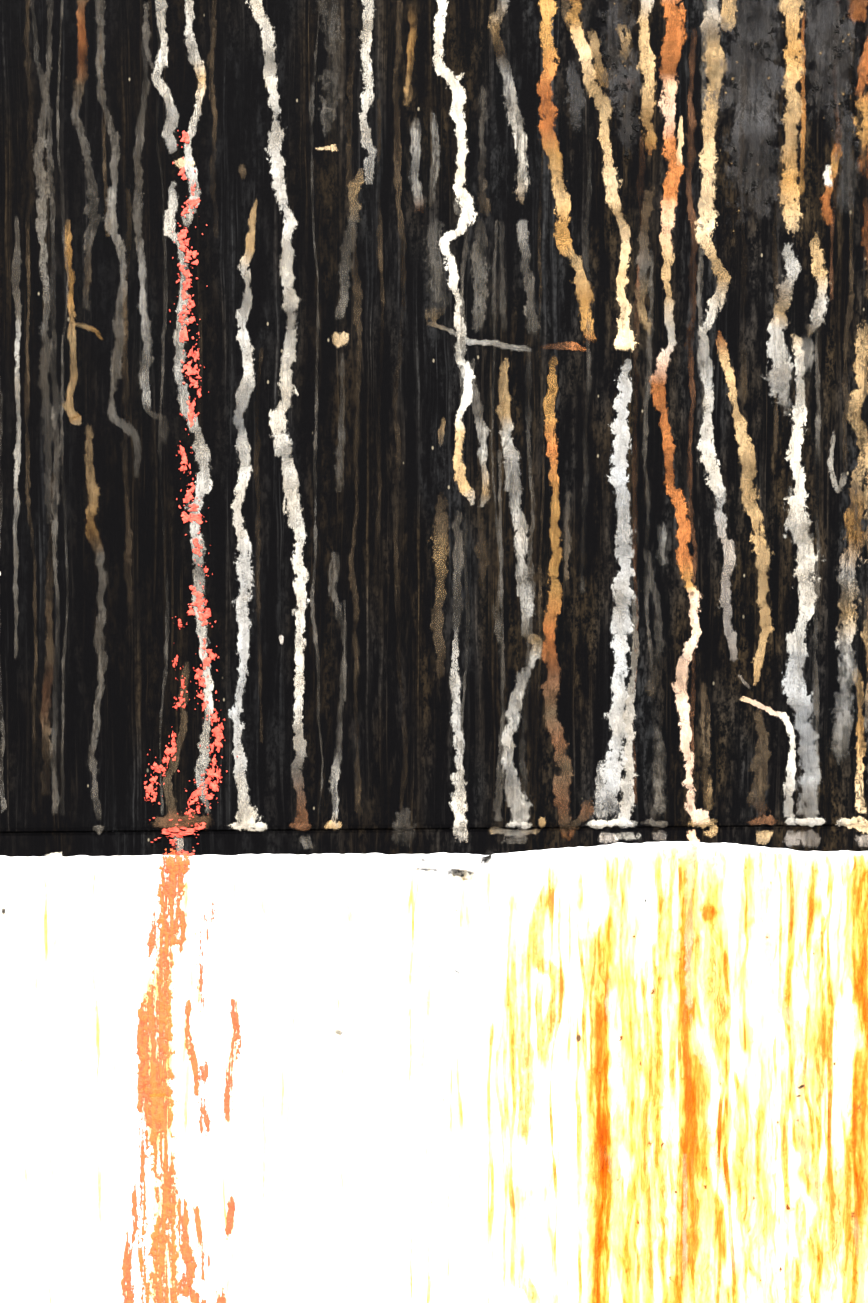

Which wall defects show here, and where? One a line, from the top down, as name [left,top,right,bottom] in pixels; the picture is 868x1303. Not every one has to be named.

water stain [162,0,217,344]
water stain [266,78,297,237]
corrosion [853,38,868,140]
water stain [429,0,737,860]
water stain [690,342,754,496]
water stain [163,443,253,829]
water stain [747,593,825,841]
corrosion [536,966,563,1039]
corrosion [583,1001,623,1190]
corrosion [678,1003,697,1130]
corrosion [675,1083,730,1210]
corrosion [819,1020,836,1154]